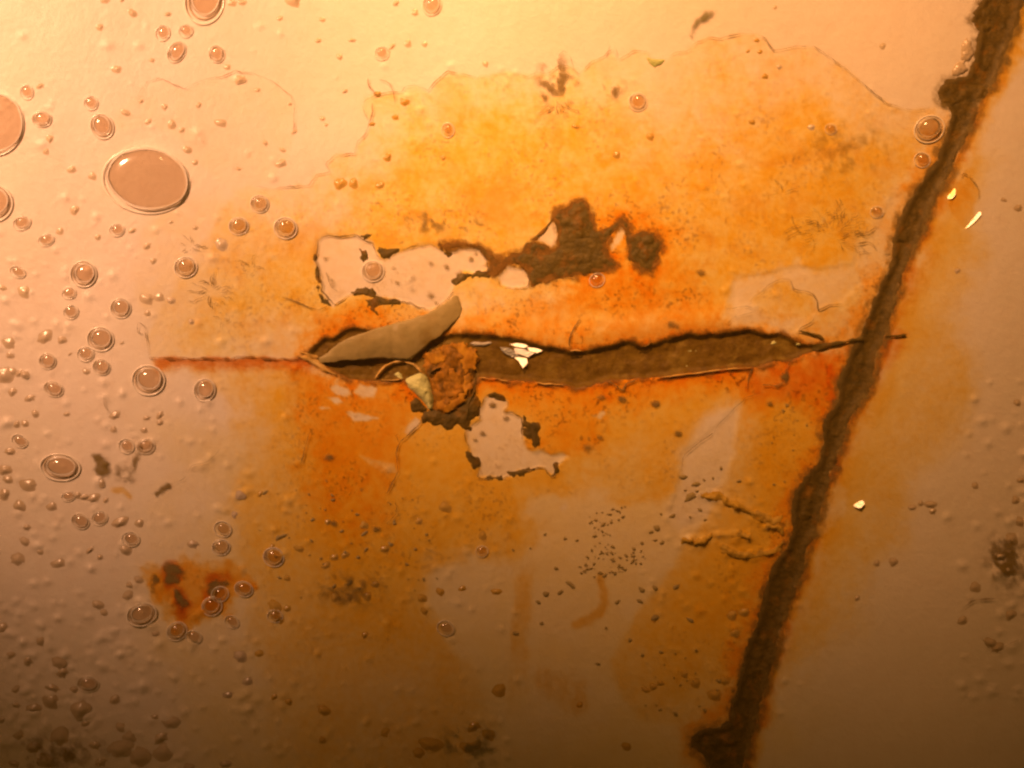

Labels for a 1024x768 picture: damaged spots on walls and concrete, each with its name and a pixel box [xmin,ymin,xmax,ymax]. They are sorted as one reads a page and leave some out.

peeling [313,234,530,315]
rust [439,198,665,287]
peeling [375,360,434,413]
rust [421,322,824,430]
peeling [464,392,563,481]
rust [153,563,188,606]